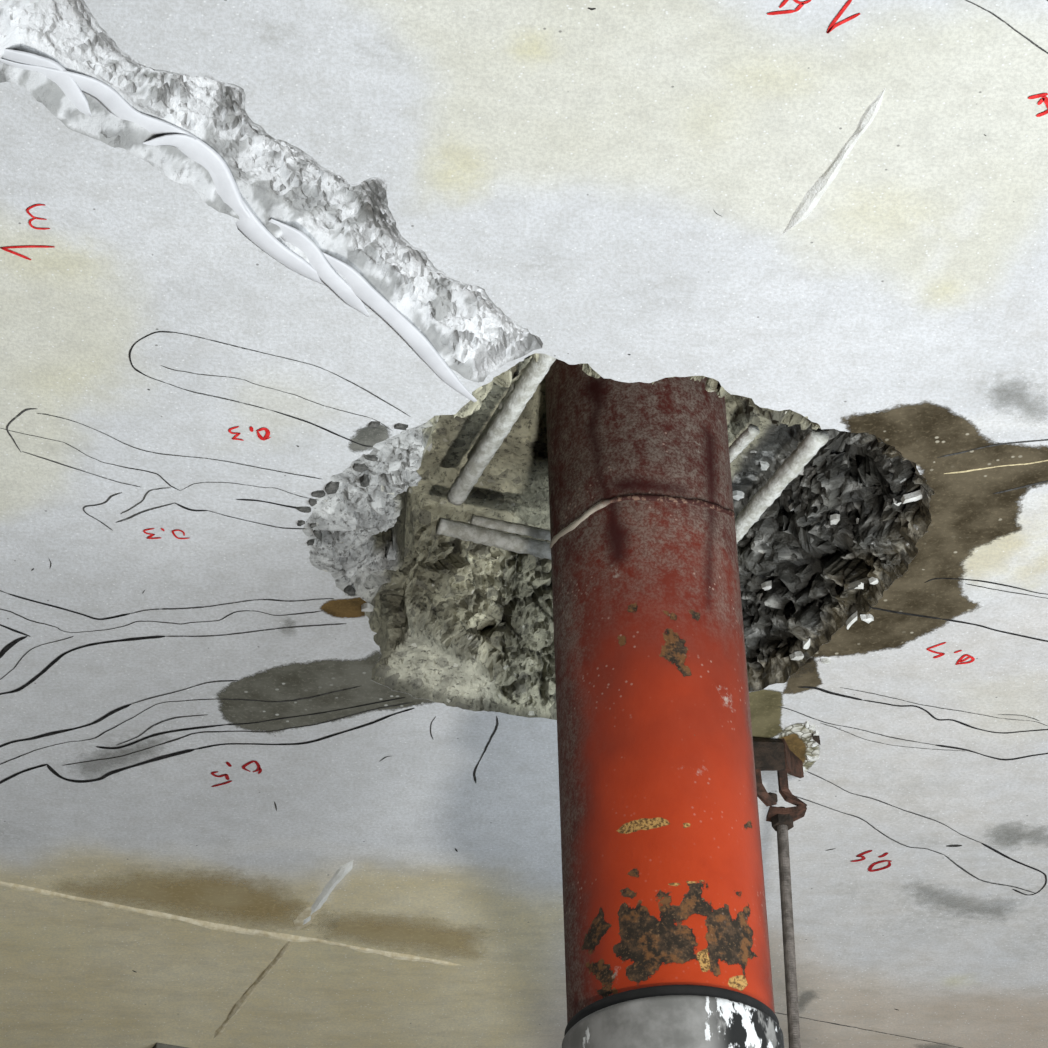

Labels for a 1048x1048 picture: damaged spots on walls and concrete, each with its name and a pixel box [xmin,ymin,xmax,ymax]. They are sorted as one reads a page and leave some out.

spalling [0,0,557,720]
spalling [580,363,601,378]
rust [320,597,367,618]
spalling [690,376,934,692]
leakage [749,402,1048,738]
leakage [217,651,433,733]
leakage [85,877,292,922]